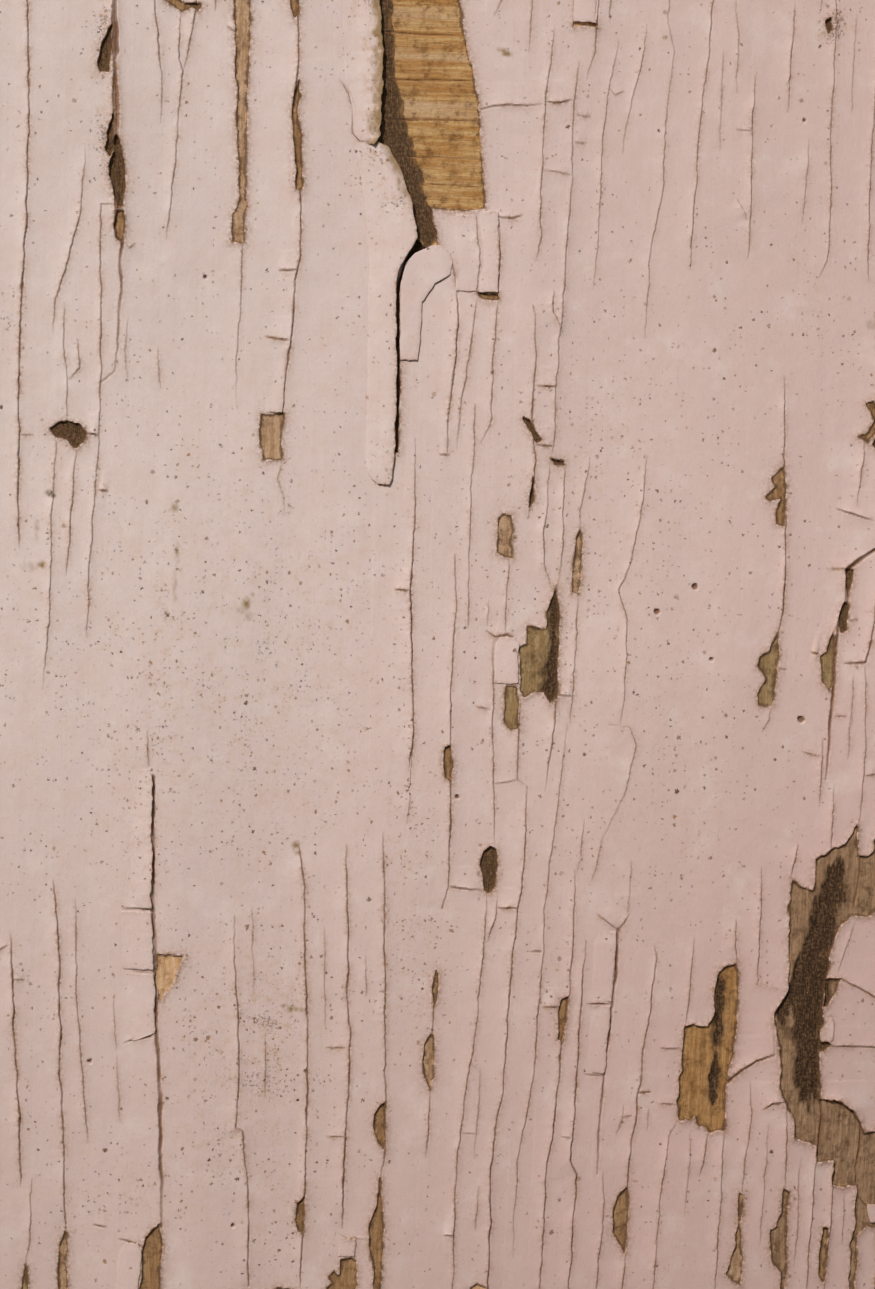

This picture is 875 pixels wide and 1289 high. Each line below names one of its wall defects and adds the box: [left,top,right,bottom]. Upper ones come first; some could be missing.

crack [16,0,203,639]
peeling [93,731,186,1289]
crack [259,0,306,516]
crack [232,290,491,1289]
peeling [339,0,544,485]
peeling [443,459,592,1289]
crack [471,455,659,1289]
crack [493,0,875,594]
peeling [652,920,740,1289]
peeling [757,377,789,733]
peeling [726,825,875,1289]
crack [756,401,875,994]